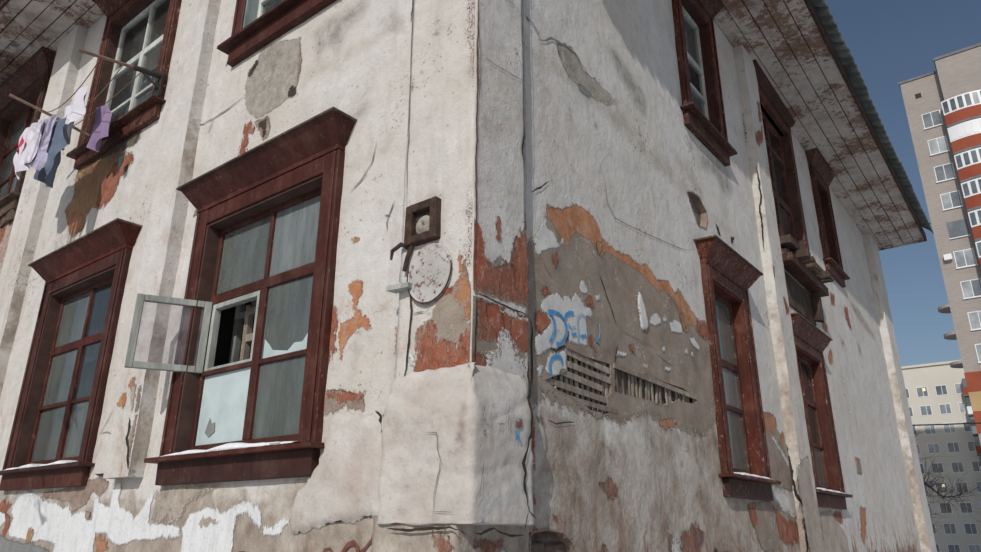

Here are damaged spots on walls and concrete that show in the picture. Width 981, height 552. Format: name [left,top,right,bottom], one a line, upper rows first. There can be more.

spalling [238,37,302,155]
spalling [539,37,616,105]
peeling [64,131,144,237]
crack [598,159,692,250]
crack [756,167,764,248]
crack [387,0,548,537]
peeling [328,279,372,363]
peeling [409,204,716,470]
peeling [0,476,290,552]
spalling [529,514,577,552]
peeling [668,522,705,552]
crack [786,444,809,552]